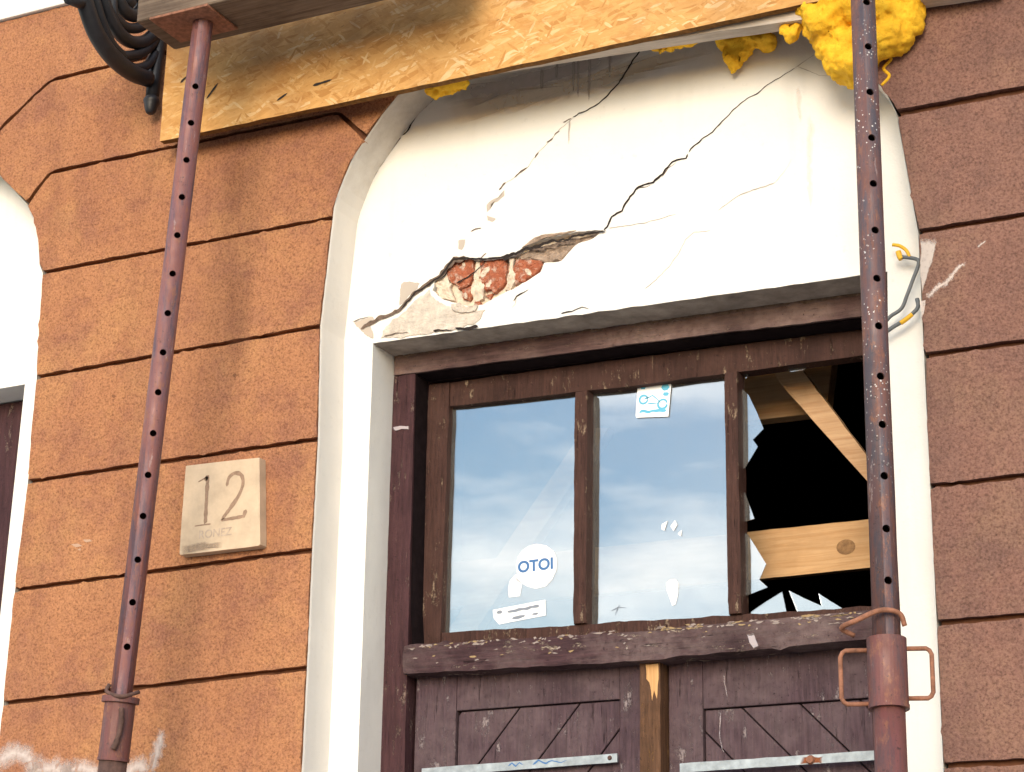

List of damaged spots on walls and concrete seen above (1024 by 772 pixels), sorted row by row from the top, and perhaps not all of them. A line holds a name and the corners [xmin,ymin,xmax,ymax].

crack [458,52,640,258]
crack [604,54,825,230]
crack [385,325,478,336]
spalling [353,230,606,338]
crack [646,169,786,288]